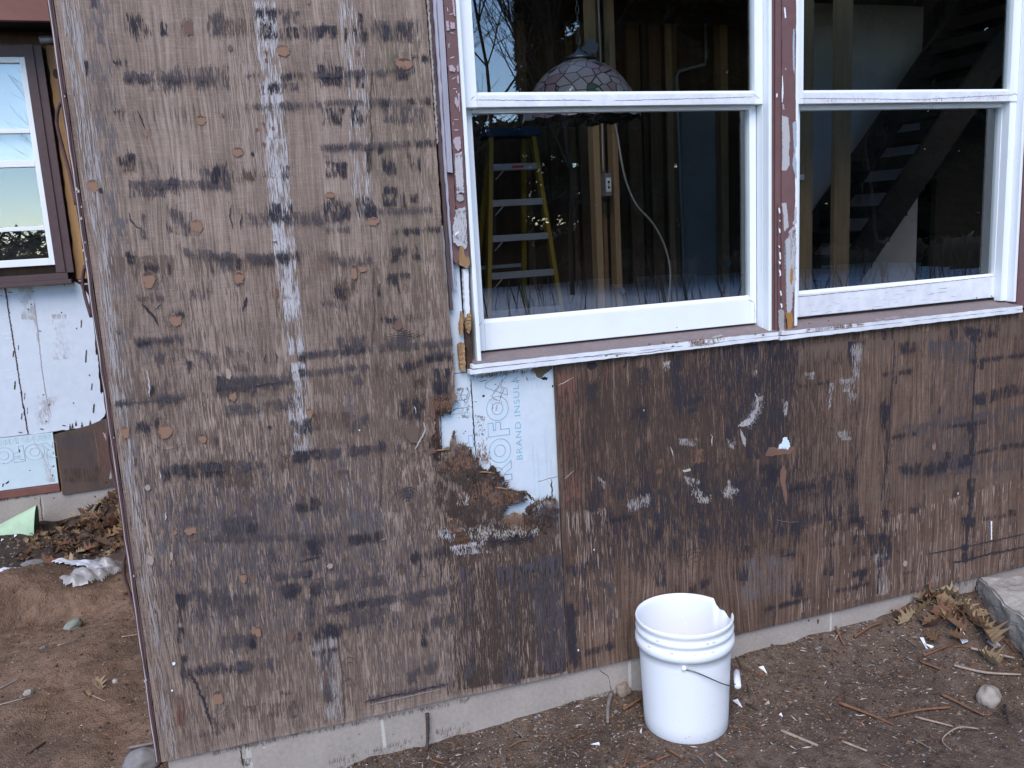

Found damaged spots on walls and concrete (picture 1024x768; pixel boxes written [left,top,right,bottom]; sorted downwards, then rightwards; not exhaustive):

peeling [776,29,797,178]
peeling [452,136,467,249]
peeling [778,203,797,331]